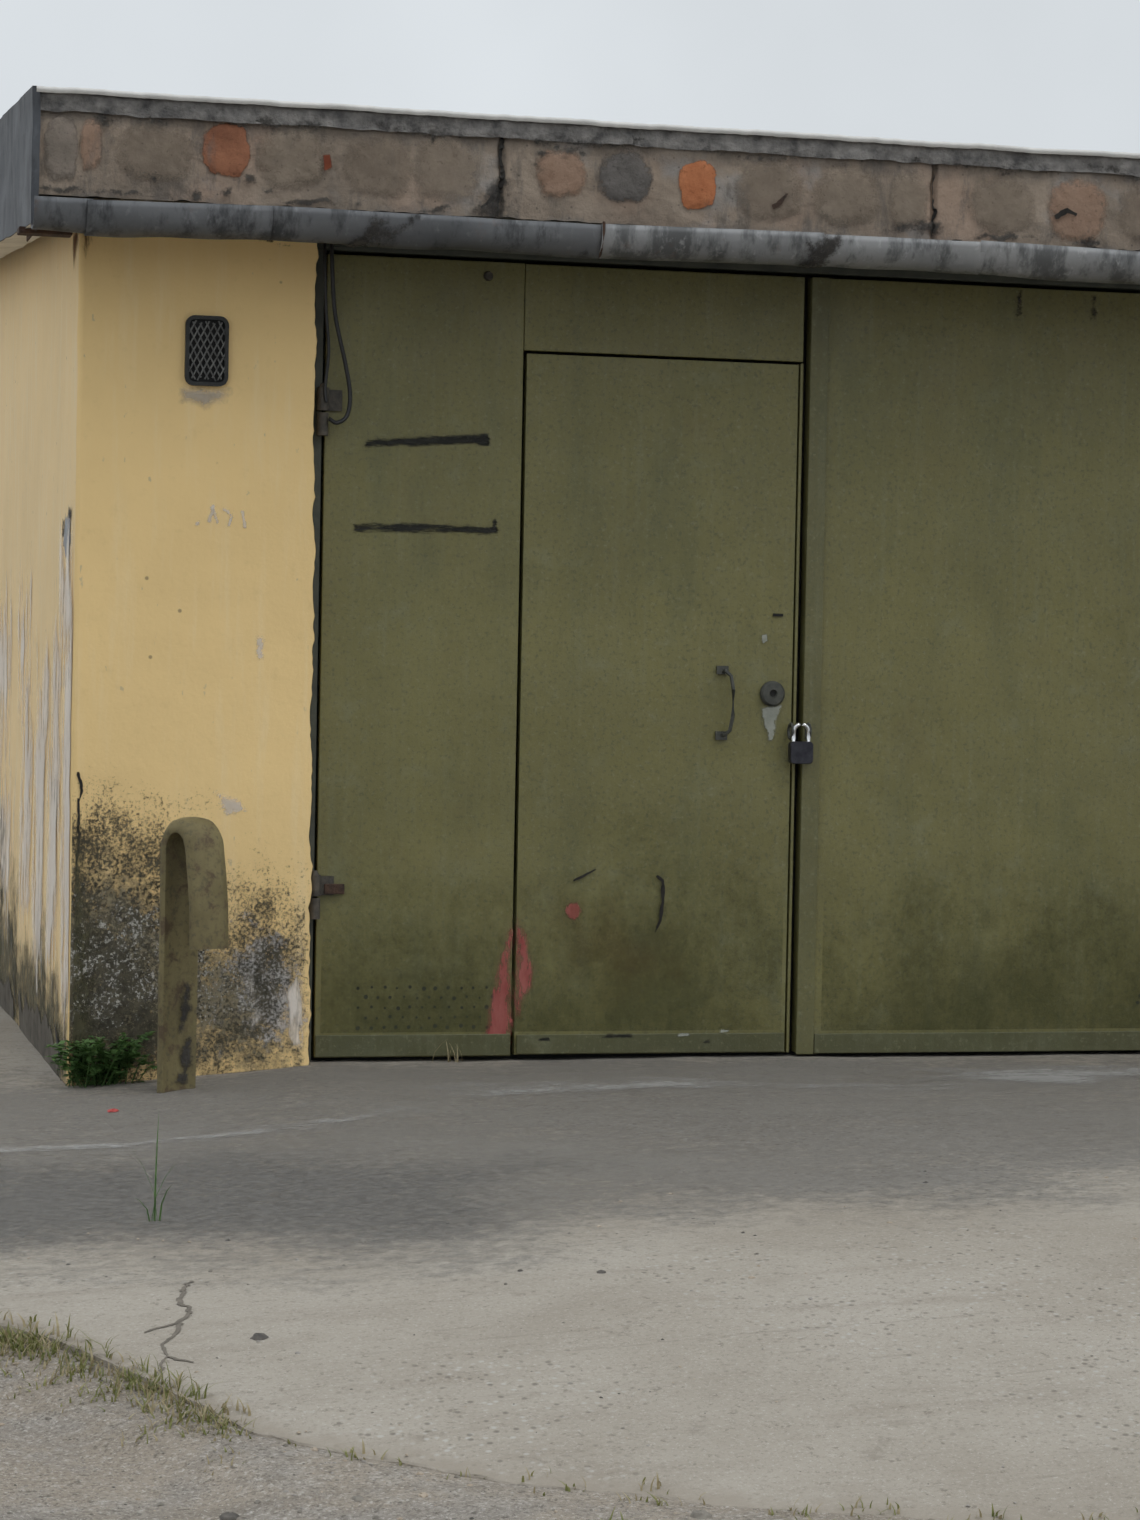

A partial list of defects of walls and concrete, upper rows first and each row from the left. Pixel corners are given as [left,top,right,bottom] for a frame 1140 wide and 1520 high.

water stain [34,926,45,998]
water stain [69,784,209,1086]
water stain [196,866,309,1075]
crack [145,1281,195,1373]